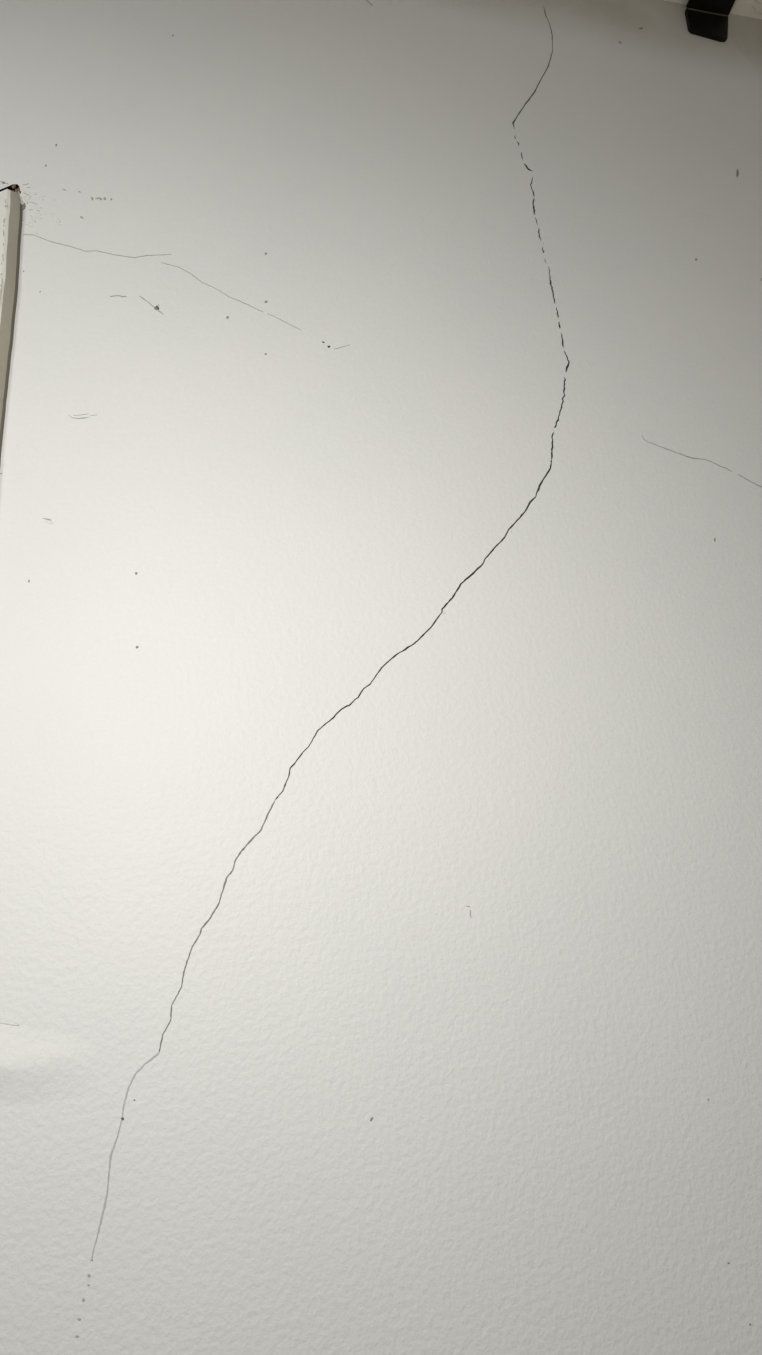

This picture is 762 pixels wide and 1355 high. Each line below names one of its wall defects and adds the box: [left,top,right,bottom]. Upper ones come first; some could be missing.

crack [23,234,348,349]
crack [76,6,572,1338]